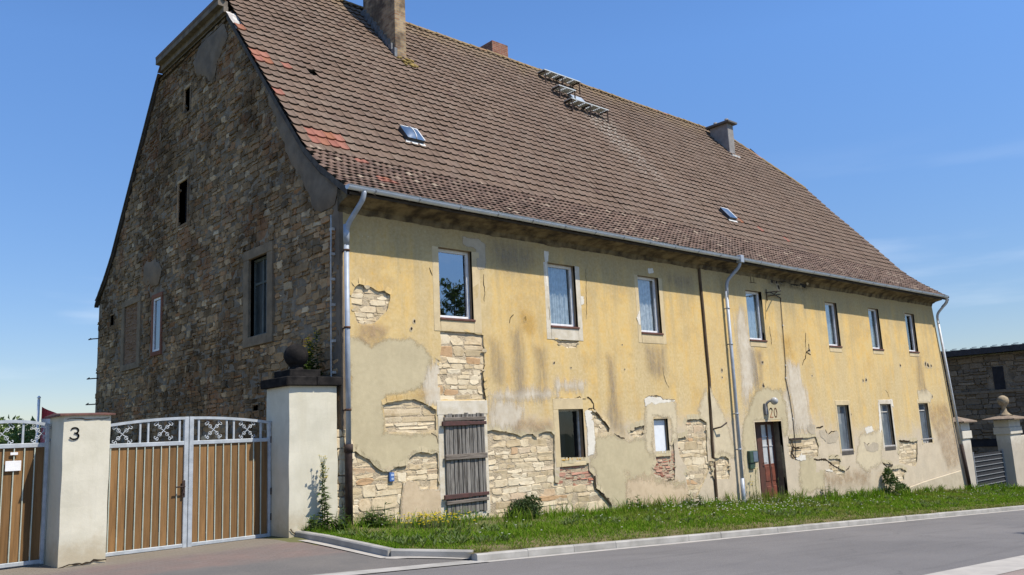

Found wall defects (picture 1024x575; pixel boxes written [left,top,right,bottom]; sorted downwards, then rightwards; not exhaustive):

flaking render [350,277,392,325]
flaking render [337,329,616,525]
peeling [645,396,675,406]
flaking render [651,414,732,498]
peeling [782,360,846,477]
crack [792,411,850,471]
flaking render [864,399,917,482]